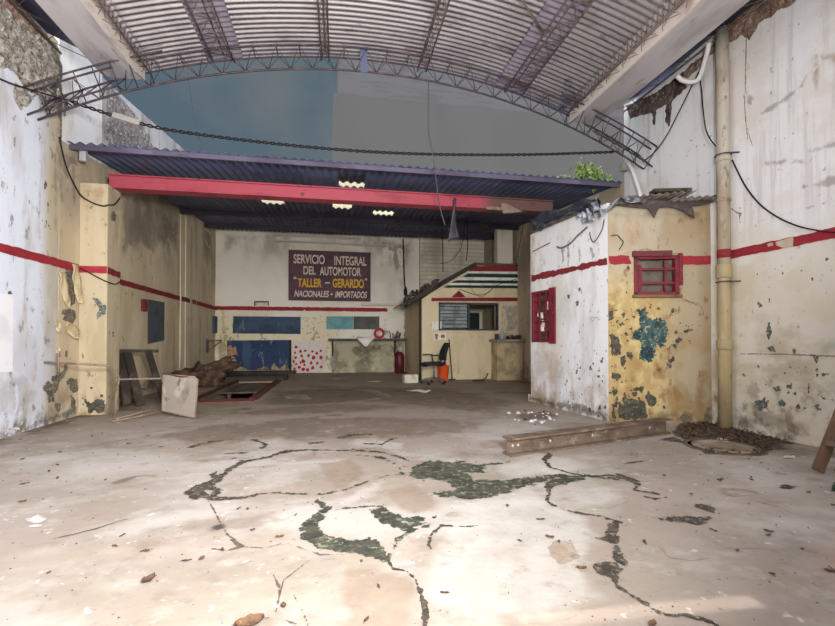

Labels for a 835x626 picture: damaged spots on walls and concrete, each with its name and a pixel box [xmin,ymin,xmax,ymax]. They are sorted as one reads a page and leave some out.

flaking render [0,0,61,111]
flaking render [105,89,153,149]
flaking render [626,42,715,126]
flaking render [727,0,796,42]
damp [760,137,835,168]
damp [795,48,835,100]
flaking render [55,264,106,339]
flaking render [43,346,105,416]
peeling [565,266,700,422]
damp [746,372,818,439]
crack [183,433,478,626]
crack [541,452,719,626]